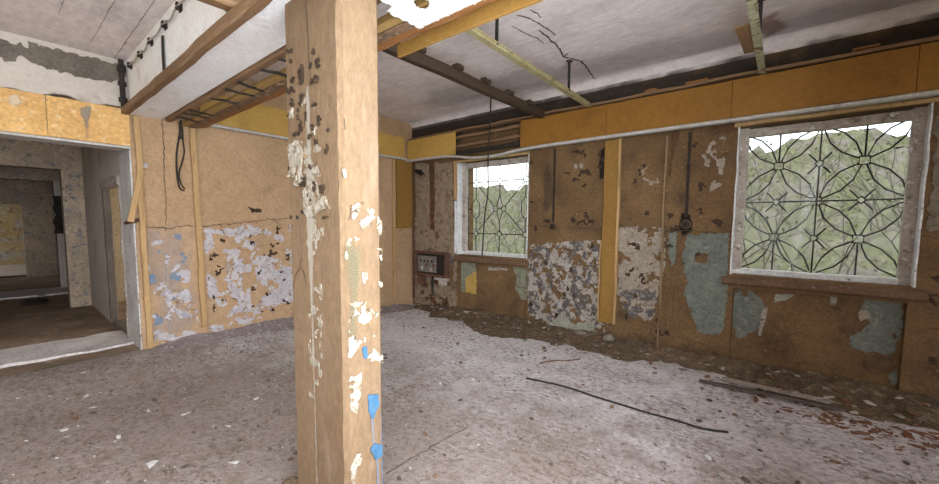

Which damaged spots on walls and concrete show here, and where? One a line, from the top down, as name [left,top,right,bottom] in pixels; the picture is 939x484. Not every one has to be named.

spalling [0,39,127,83]
crack [512,10,596,79]
peeling [691,136,727,192]
peeling [151,48,330,343]
peeling [344,202,382,259]
spalling [414,162,477,307]
peeling [488,240,611,332]
peeling [617,208,793,339]
peeling [347,301,383,363]
peeling [849,300,903,355]
peeling [348,372,362,413]
peeling [349,453,362,484]